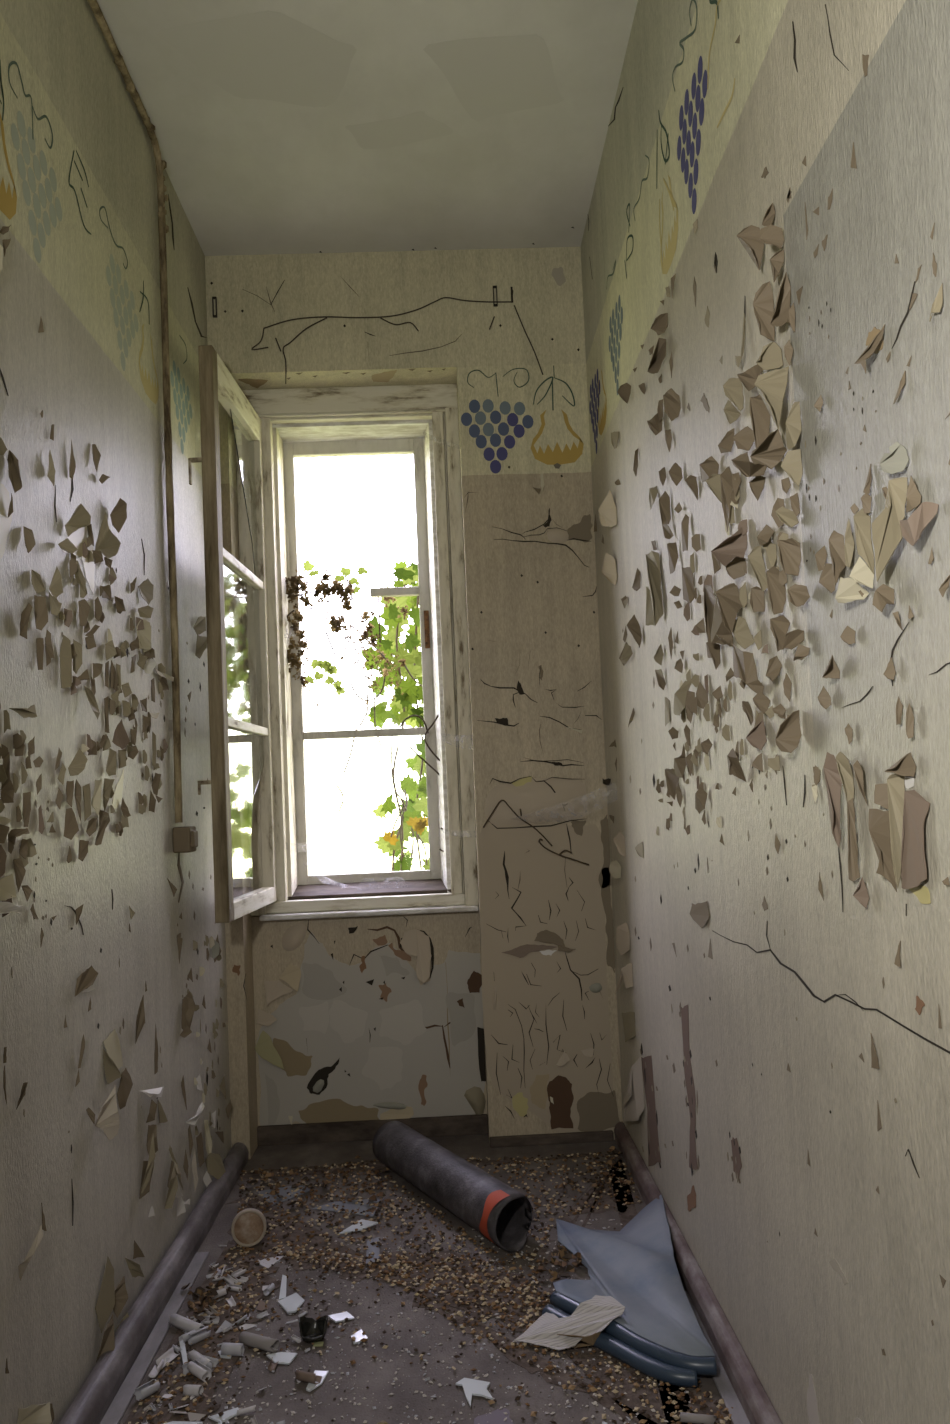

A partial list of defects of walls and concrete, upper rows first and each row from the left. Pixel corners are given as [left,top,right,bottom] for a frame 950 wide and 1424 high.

flaking render [0,437,36,560]
peeling [40,410,76,486]
peeling [92,444,110,484]
peeling [811,696,950,908]
peeling [75,948,102,1087]
peeling [86,912,232,1217]
flaking render [255,926,486,1126]
peeling [501,930,575,958]
flaking render [547,1075,574,1129]
flaking render [622,985,699,1174]
crack [712,921,950,1054]
peeling [95,1240,145,1362]